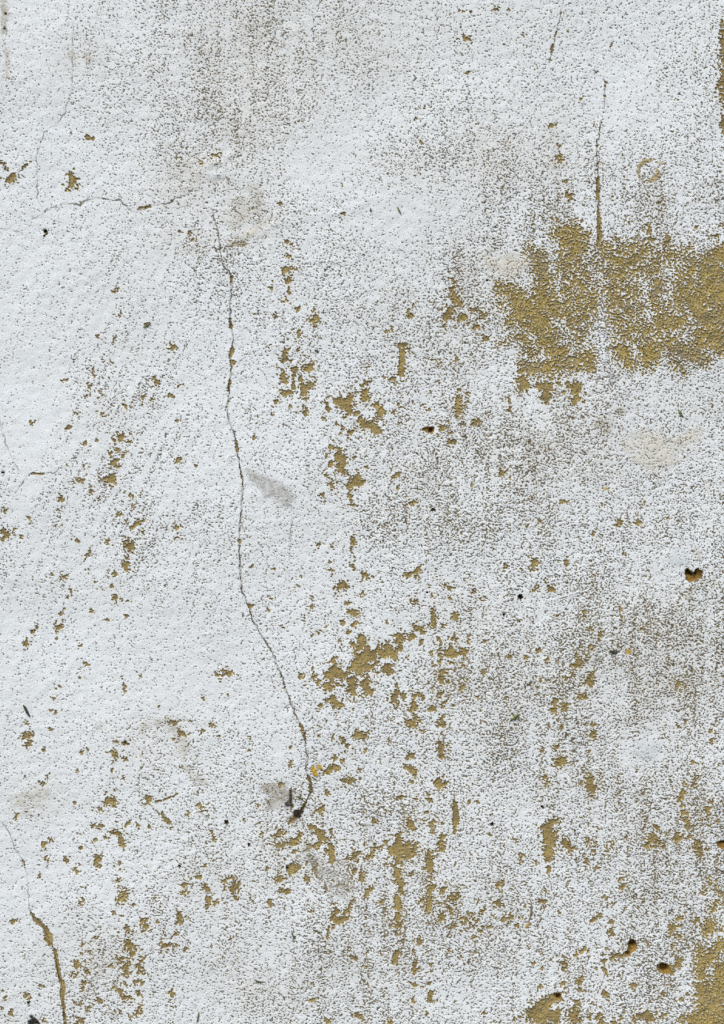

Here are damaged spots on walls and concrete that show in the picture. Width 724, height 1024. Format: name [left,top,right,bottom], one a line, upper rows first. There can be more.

peeling [0,507,33,544]
crack [0,821,67,1024]
peeling [46,572,91,680]
peeling [55,430,145,619]
peeling [37,736,189,1024]
peeling [158,705,221,741]
crack [213,216,313,822]
peeling [267,239,460,522]
peeling [178,531,617,1016]
peeling [420,380,486,451]
peeling [438,179,724,419]
peeling [512,757,724,1024]